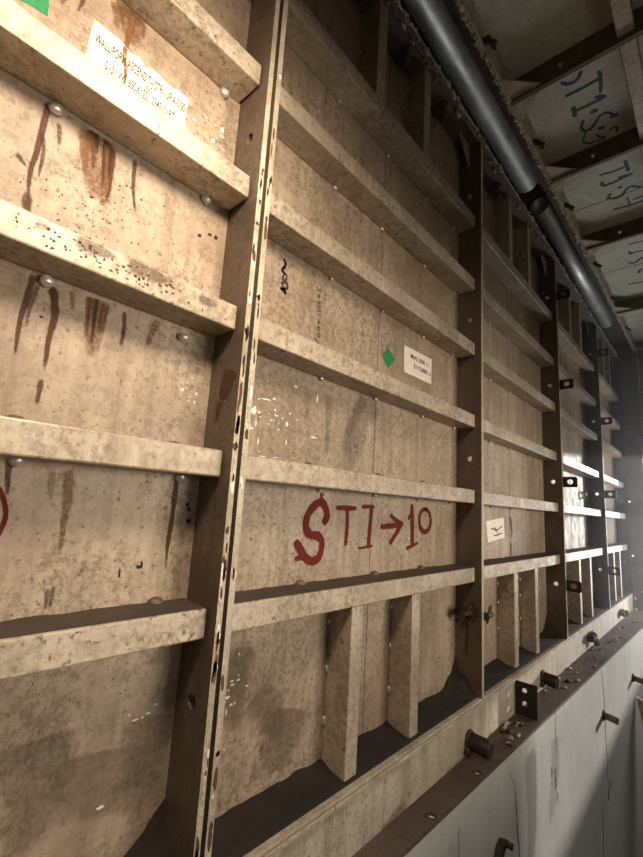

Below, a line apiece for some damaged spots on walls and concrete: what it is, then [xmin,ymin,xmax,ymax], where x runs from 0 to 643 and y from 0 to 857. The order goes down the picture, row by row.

rust [113,5,145,84]
rust [17,104,62,211]
rust [80,130,116,202]
rust [15,275,60,366]
rust [85,298,109,352]
rust [216,370,237,419]
rust [60,471,73,549]
rust [166,481,179,564]
crack [509,771,520,857]